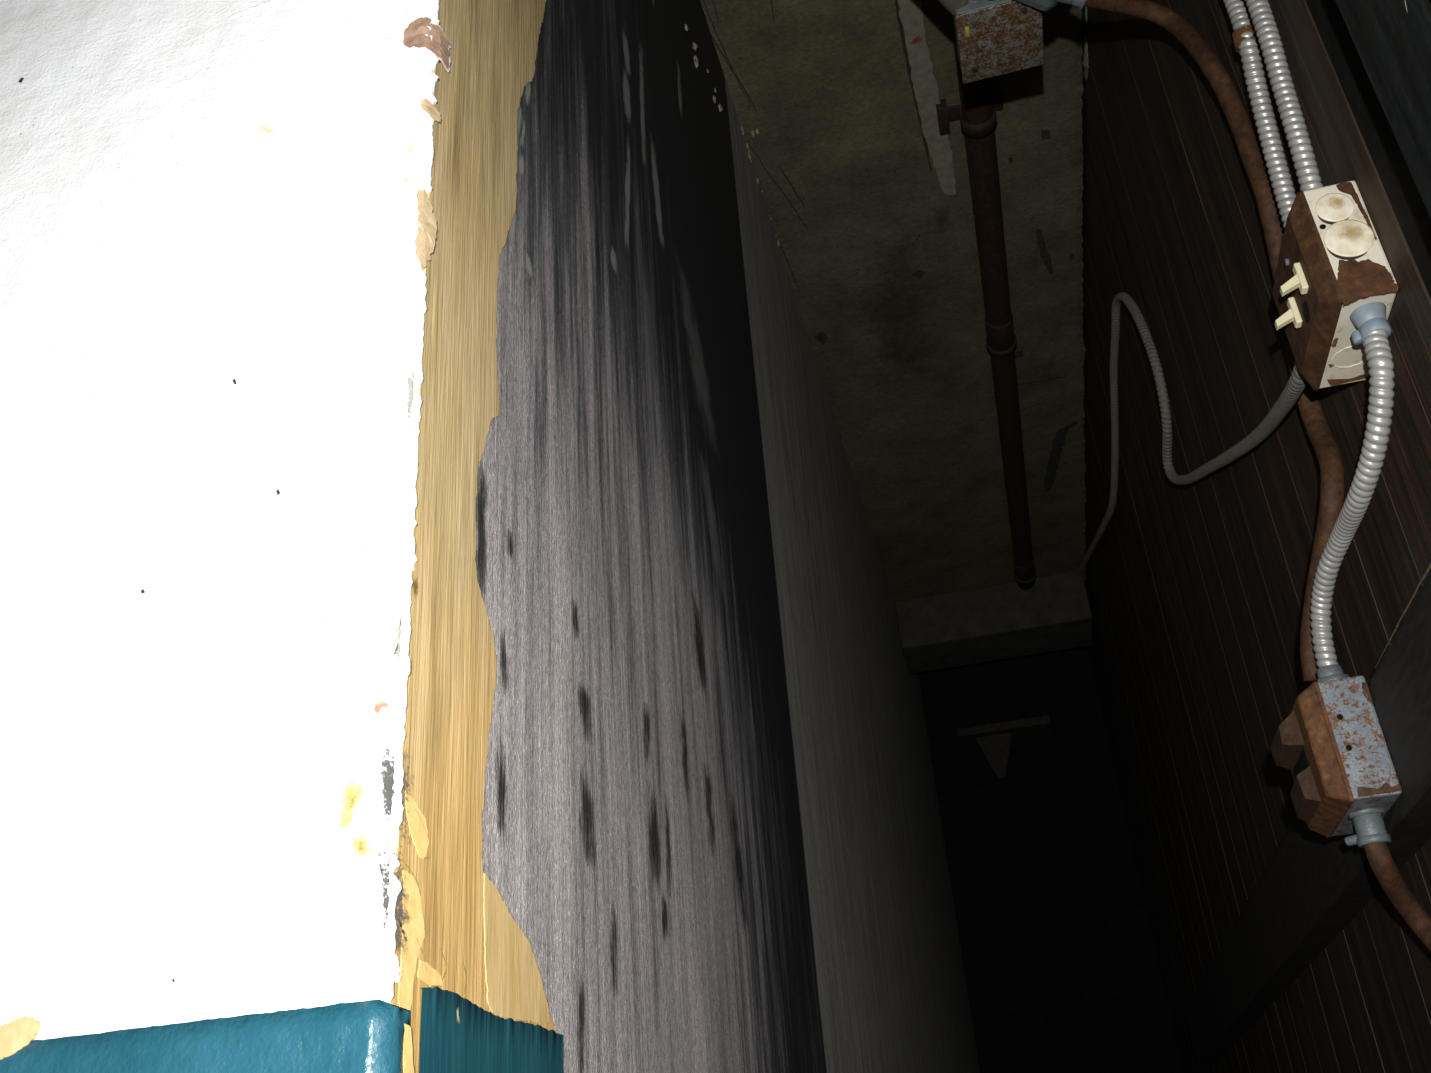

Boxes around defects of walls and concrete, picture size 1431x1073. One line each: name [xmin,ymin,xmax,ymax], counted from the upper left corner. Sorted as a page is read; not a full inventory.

peeling [402,16,451,72]
peeling [420,99,441,122]
peeling [414,185,437,269]
peeling [398,789,466,1073]
peeling [483,873,549,1024]
peeling [0,1016,41,1060]